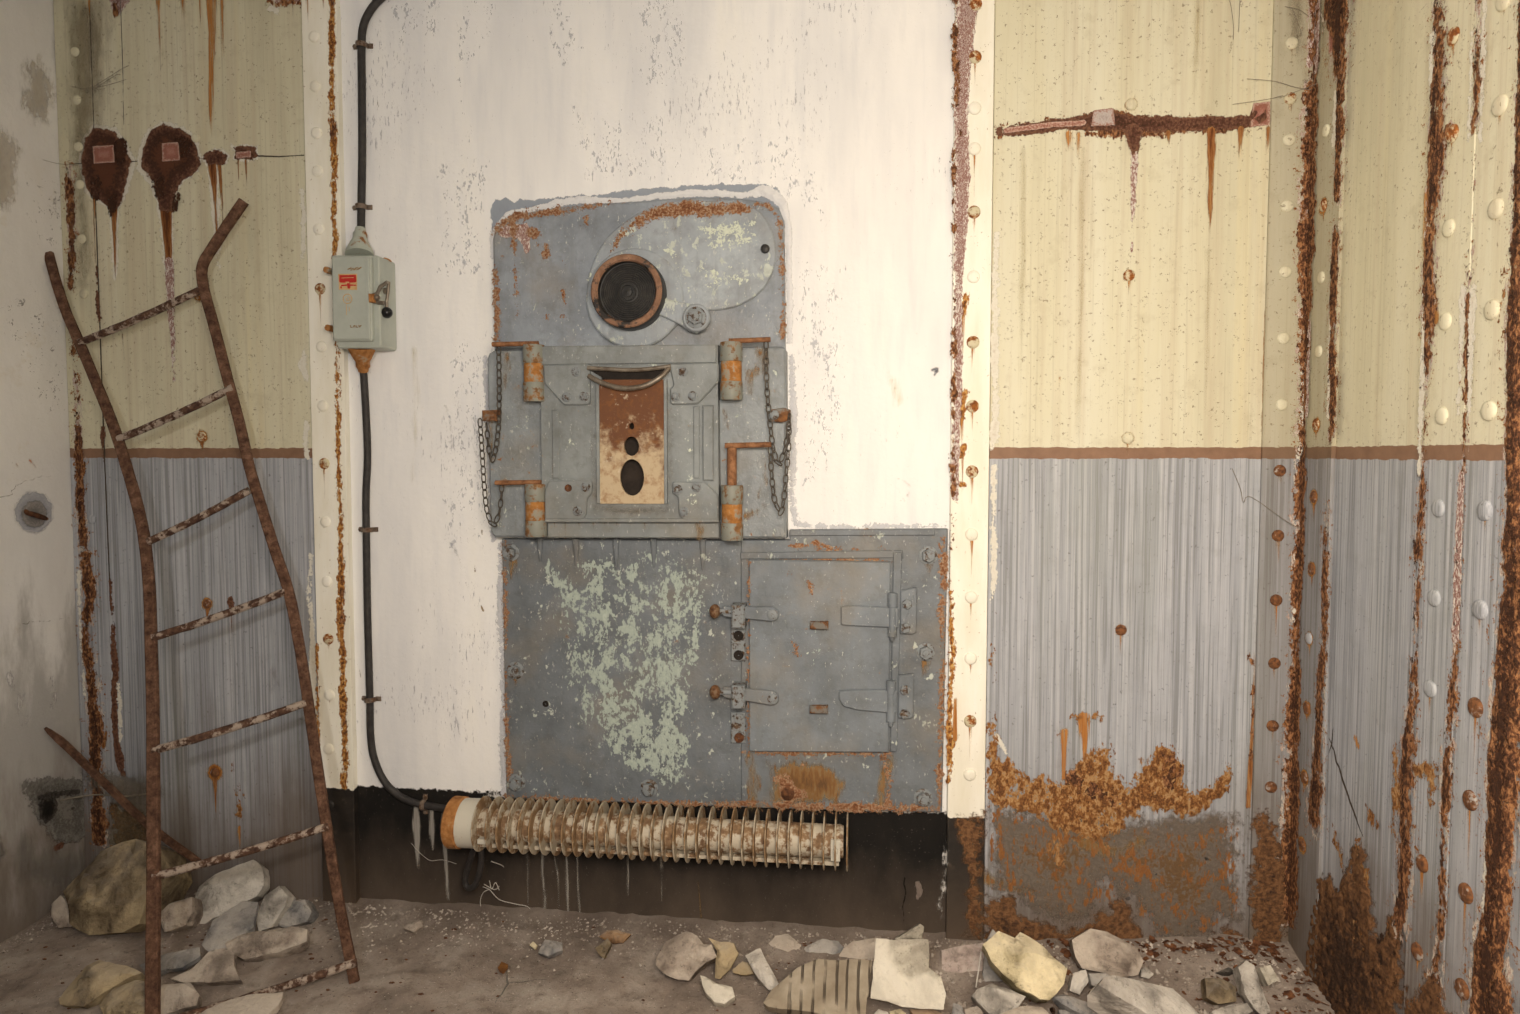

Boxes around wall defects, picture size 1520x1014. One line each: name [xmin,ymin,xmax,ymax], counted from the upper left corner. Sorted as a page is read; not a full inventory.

corrosion [181,0,223,125]
corrosion [292,0,340,259]
corrosion [60,160,103,383]
corrosion [68,339,126,848]
corrosion [202,596,235,629]
corrosion [315,341,361,789]
corrosion [491,0,1520,1014]
corrosion [208,763,244,841]